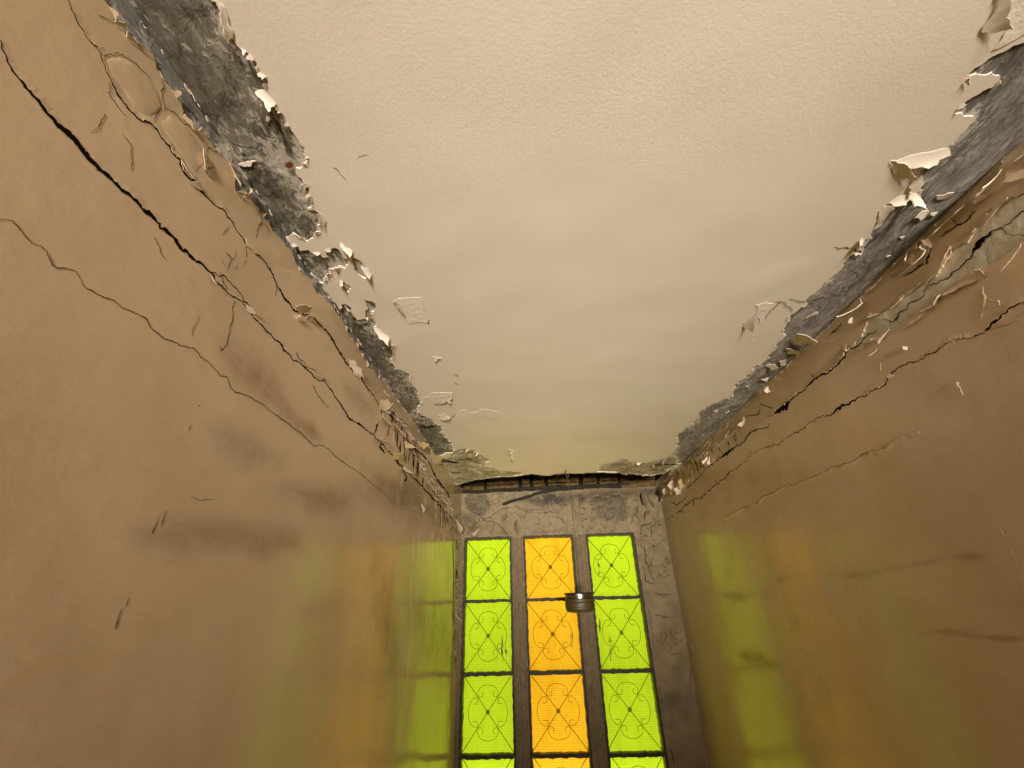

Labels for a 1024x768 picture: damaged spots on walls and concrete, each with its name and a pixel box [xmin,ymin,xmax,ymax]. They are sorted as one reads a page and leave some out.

crack [0,0,1024,598]
flaking render [105,0,1024,669]